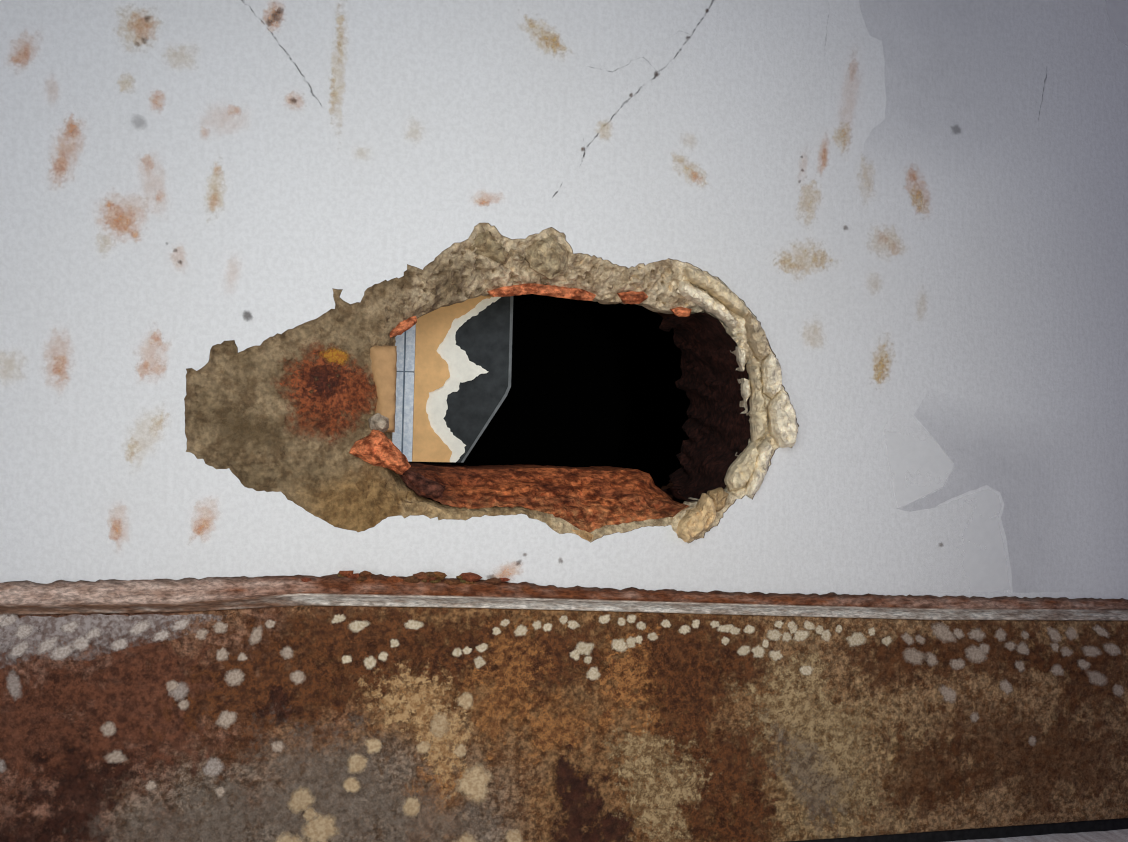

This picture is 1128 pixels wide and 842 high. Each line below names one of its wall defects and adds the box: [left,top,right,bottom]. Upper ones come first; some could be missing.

rust [279,343,377,442]
spalling [184,223,798,543]
rust [0,607,794,842]
damp [732,638,892,830]
rust [840,621,1128,727]